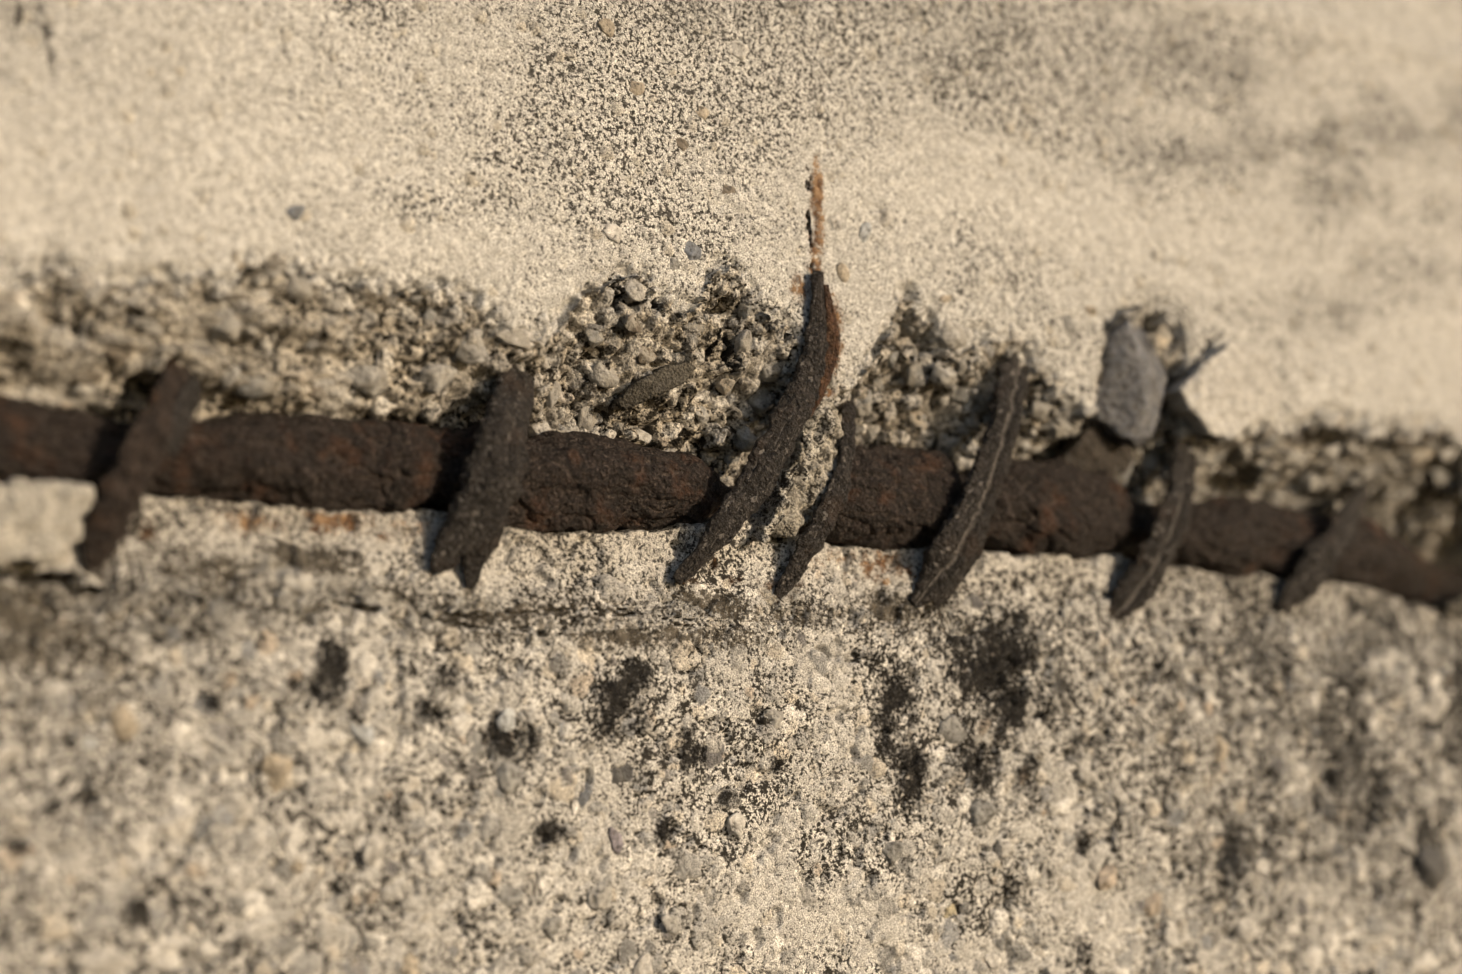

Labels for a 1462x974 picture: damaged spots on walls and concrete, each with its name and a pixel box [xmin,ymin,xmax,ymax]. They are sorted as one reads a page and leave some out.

corrosion [790,156,844,417]
spalling [0,248,802,486]
spalling [748,299,1462,574]
spalling [0,478,95,566]
corrosion [140,522,157,540]
corrosion [215,509,422,540]
corrosion [816,551,921,585]
spalling [1325,580,1462,618]